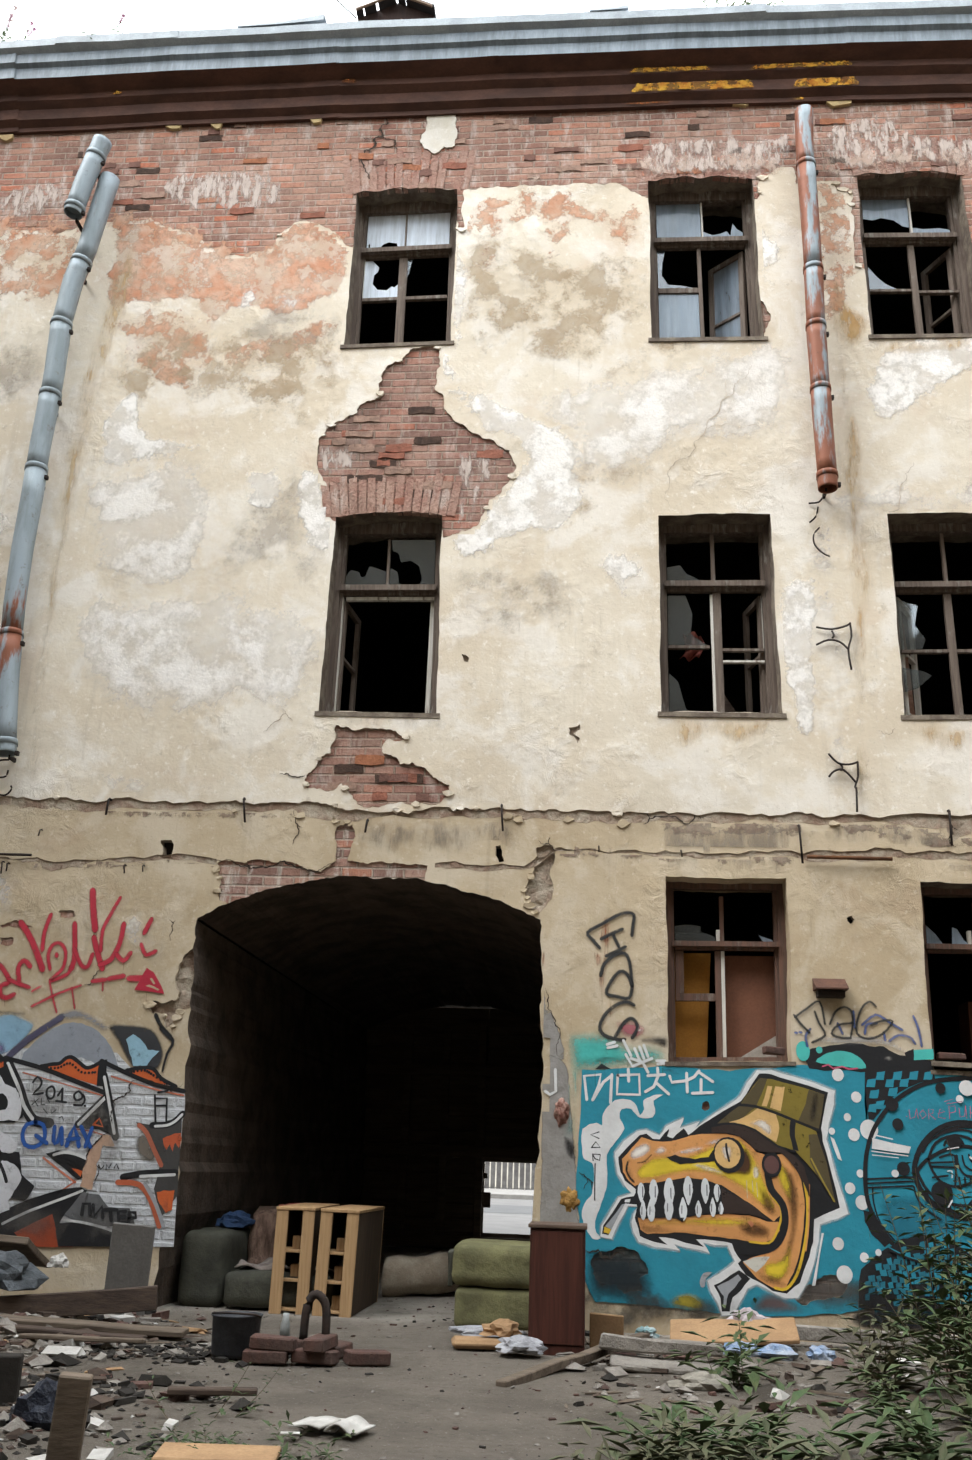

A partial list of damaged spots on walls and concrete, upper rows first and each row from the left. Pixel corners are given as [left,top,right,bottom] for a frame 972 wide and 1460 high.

spalling [0,100,972,389]
water stain [469,244,620,358]
water stain [122,332,332,403]
spalling [298,301,788,556]
crack [665,365,777,500]
crack [215,773,329,872]
spalling [0,725,972,915]
crack [645,814,711,825]
spalling [59,910,75,918]
spalling [143,949,194,1028]